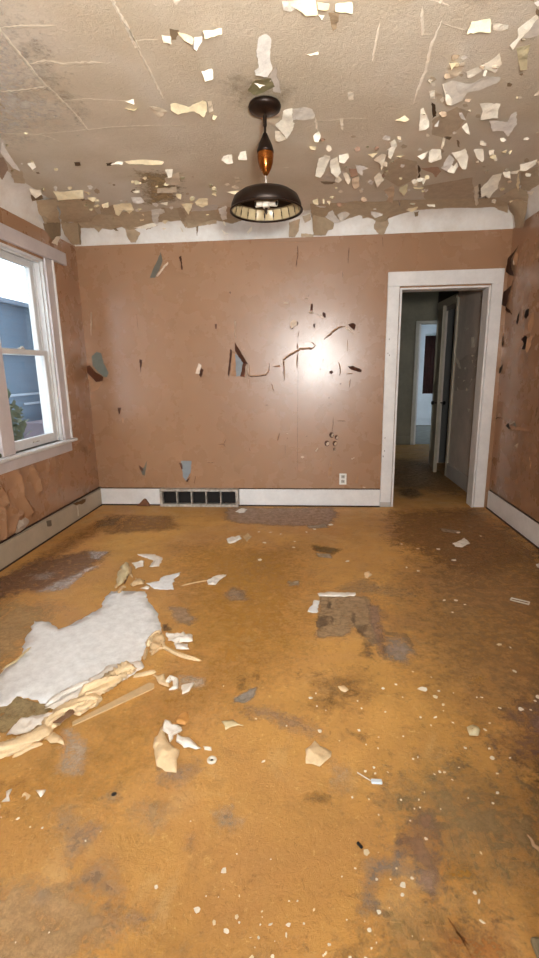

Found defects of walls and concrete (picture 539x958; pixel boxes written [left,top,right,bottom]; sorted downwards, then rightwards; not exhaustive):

peeling [282,0,353,31]
peeling [161,28,222,51]
peeling [443,0,539,76]
peeling [202,69,213,82]
peeling [260,53,539,237]
peeling [0,138,252,245]
flaking render [150,253,163,278]
flaking render [92,352,109,377]
flaking render [235,354,243,376]
flaking render [181,461,191,480]